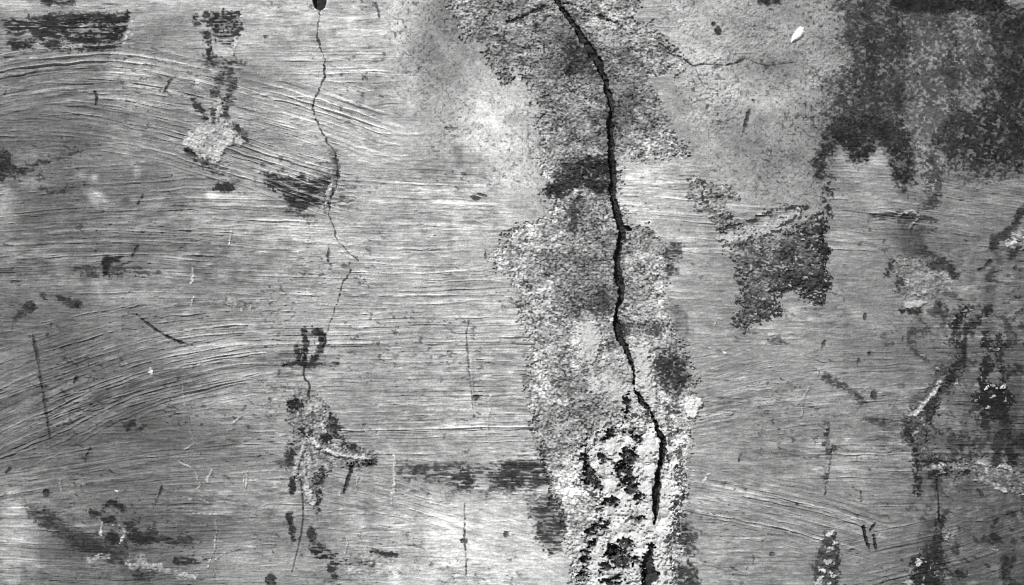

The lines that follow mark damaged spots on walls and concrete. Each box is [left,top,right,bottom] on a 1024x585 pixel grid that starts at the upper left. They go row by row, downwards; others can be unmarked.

crack [303,366,311,418]
water stain [281,326,339,368]
crack [312,10,359,345]
spalling [446,0,703,585]
crack [506,0,670,585]
spalling [685,174,834,333]
water stain [881,326,930,363]
water stain [808,0,1024,205]
water stain [943,305,1019,466]
crack [292,444,374,572]
water stain [285,513,398,579]
water stain [902,511,950,585]